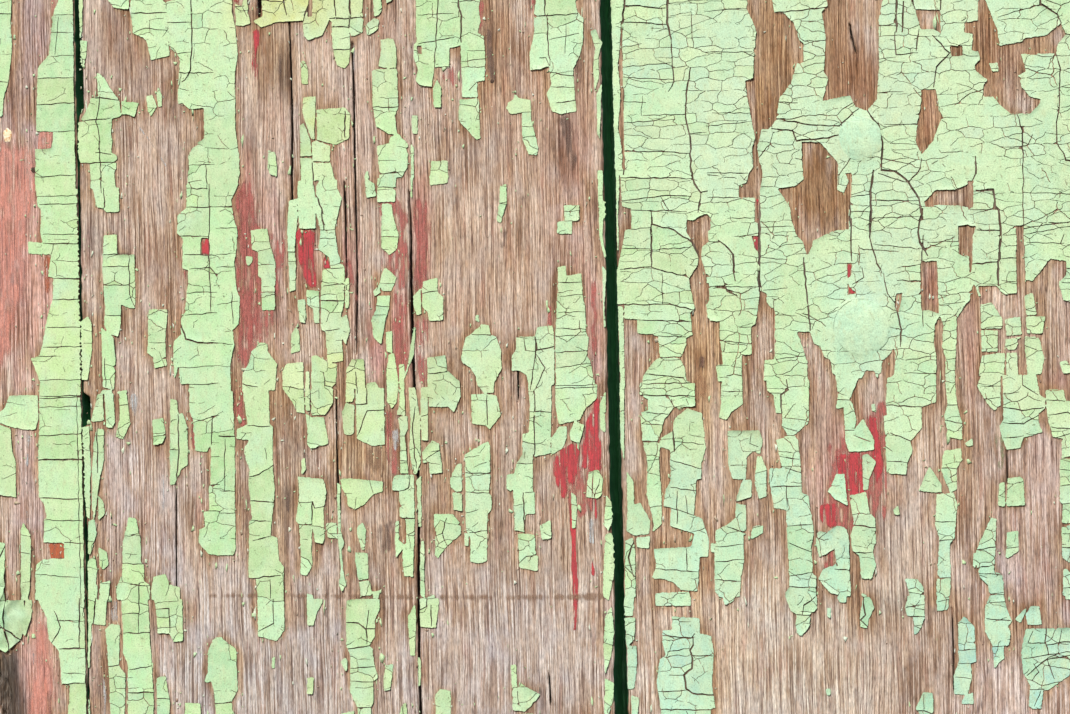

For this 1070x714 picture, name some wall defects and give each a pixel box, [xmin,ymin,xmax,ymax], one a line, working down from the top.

peeling [0,0,183,714]
crack [255,0,263,16]
crack [287,21,295,200]
crack [344,45,358,351]
peeling [108,0,606,714]
crack [408,192,416,411]
peeling [529,0,1070,714]
crack [415,523,423,714]
crack [949,618,957,690]